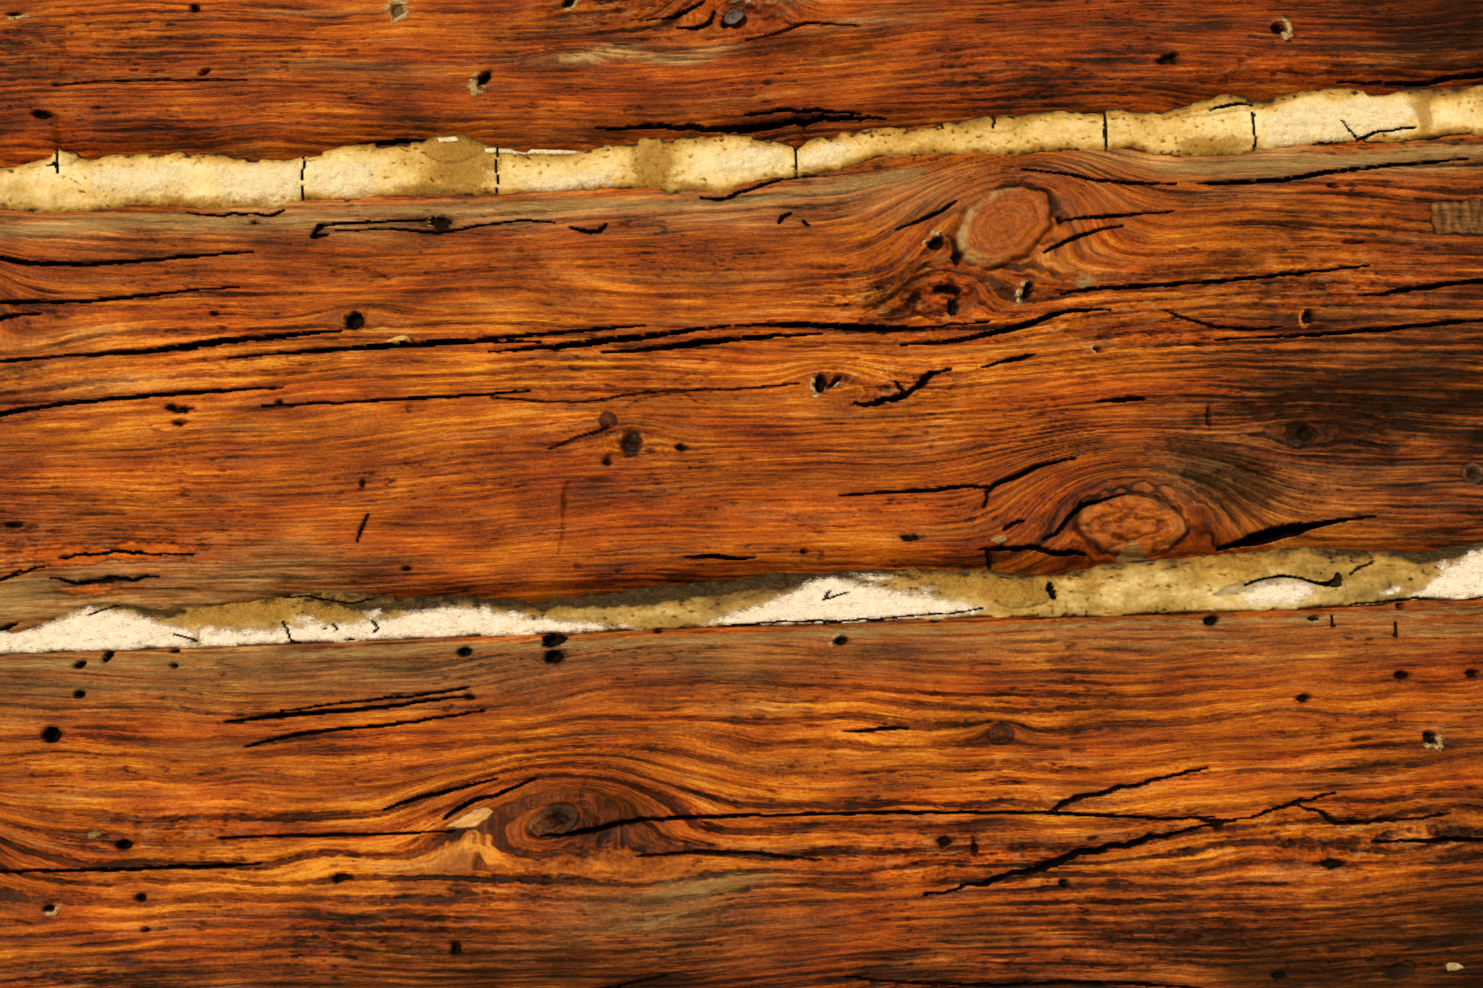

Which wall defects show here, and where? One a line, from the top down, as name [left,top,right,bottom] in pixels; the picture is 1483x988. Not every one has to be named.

crack [1337,71,1483,87]
crack [0,147,609,321]
crack [895,200,957,231]
crack [1021,102,1469,254]
crack [0,264,1483,450]
crack [540,767,1483,896]